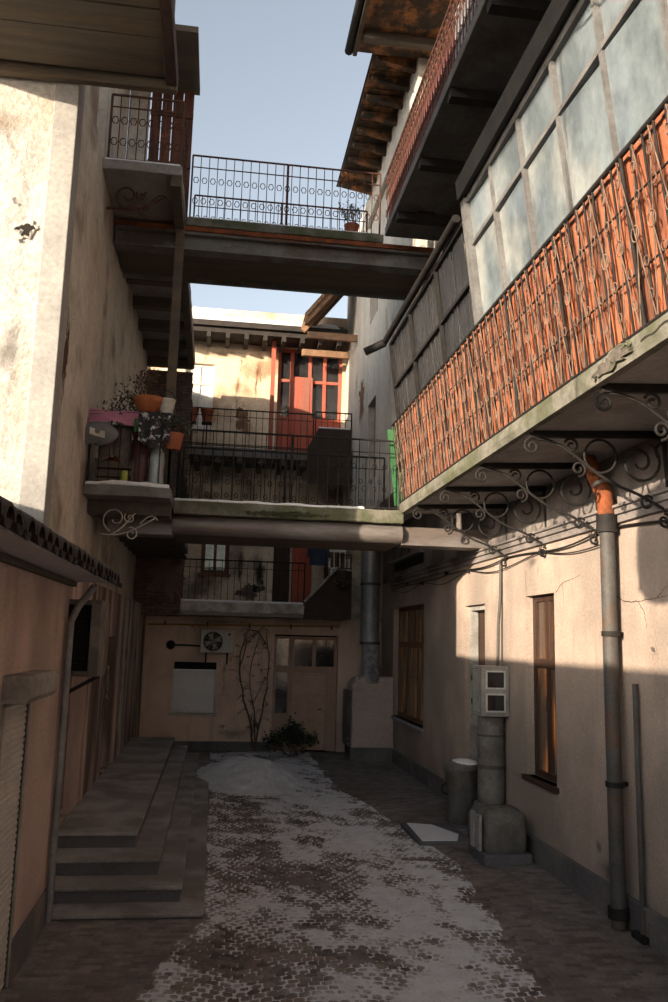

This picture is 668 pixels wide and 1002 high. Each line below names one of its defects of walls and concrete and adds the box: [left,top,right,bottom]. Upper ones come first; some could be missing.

peeling [0,125,38,383]
crack [617,586,668,629]